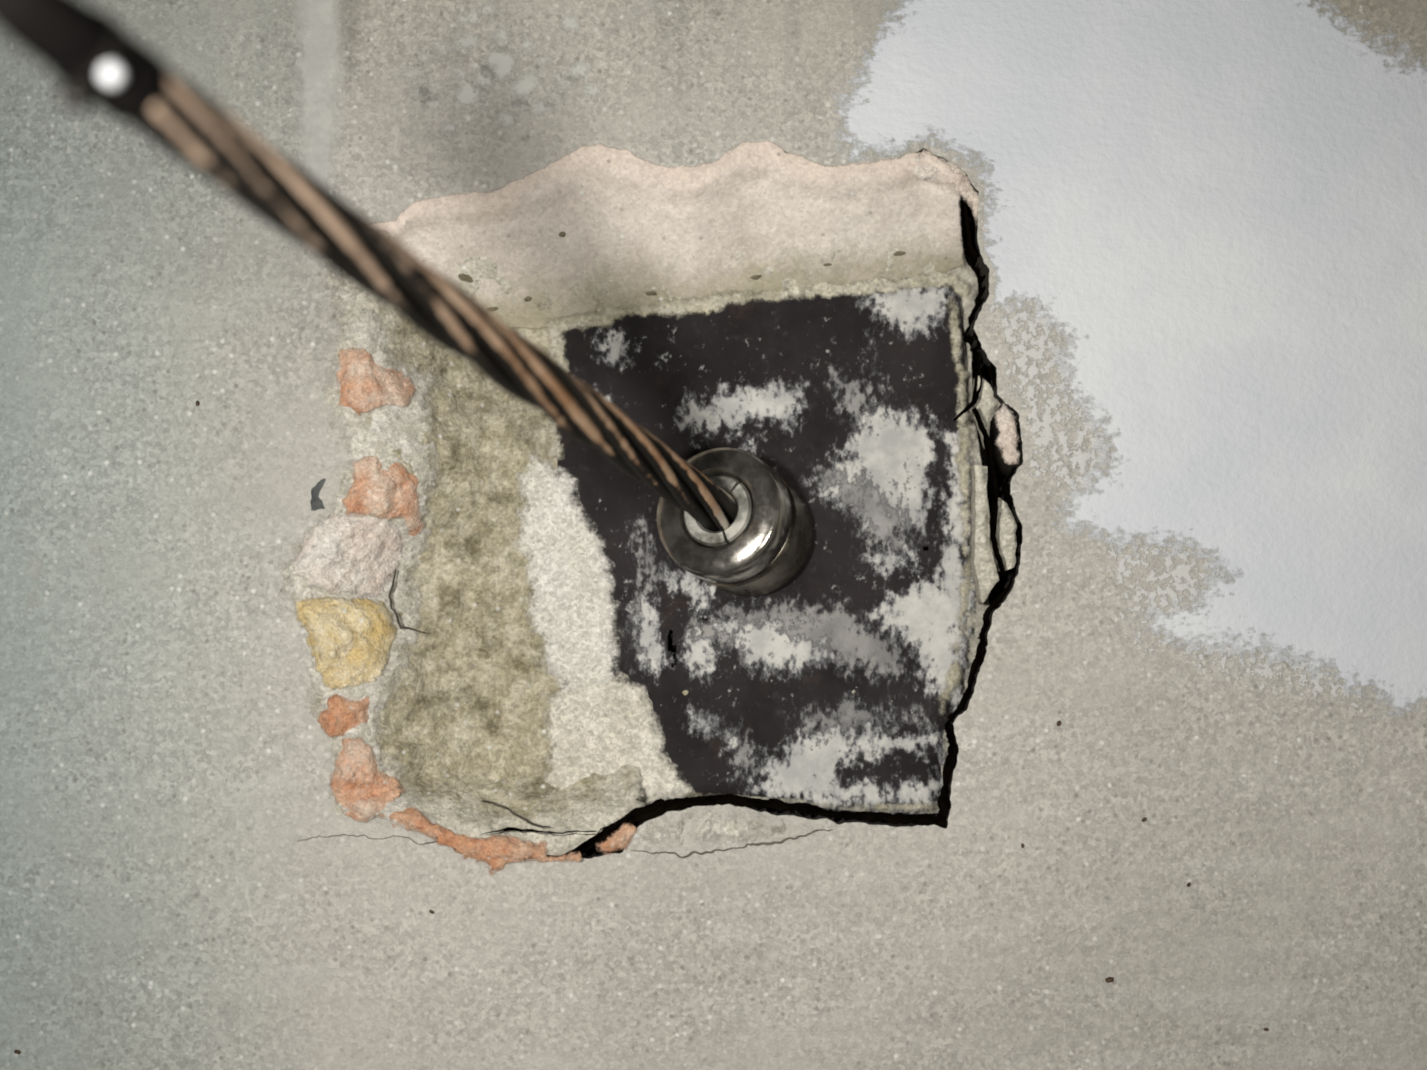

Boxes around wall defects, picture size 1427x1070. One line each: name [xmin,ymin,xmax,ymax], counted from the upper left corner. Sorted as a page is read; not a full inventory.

crack [299,834,437,845]
spalling [280,270,805,875]
spalling [375,141,1020,814]
crack [481,198,1021,862]